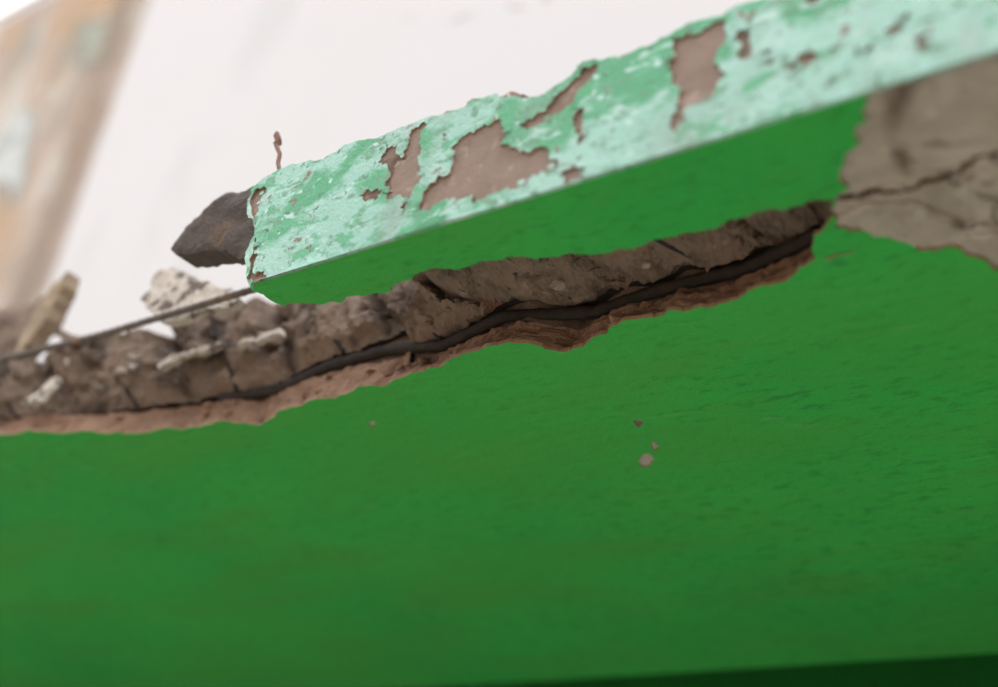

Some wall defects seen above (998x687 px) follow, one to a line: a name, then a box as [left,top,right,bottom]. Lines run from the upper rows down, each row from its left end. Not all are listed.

spalling [0,52,998,433]
peeling [663,16,752,131]